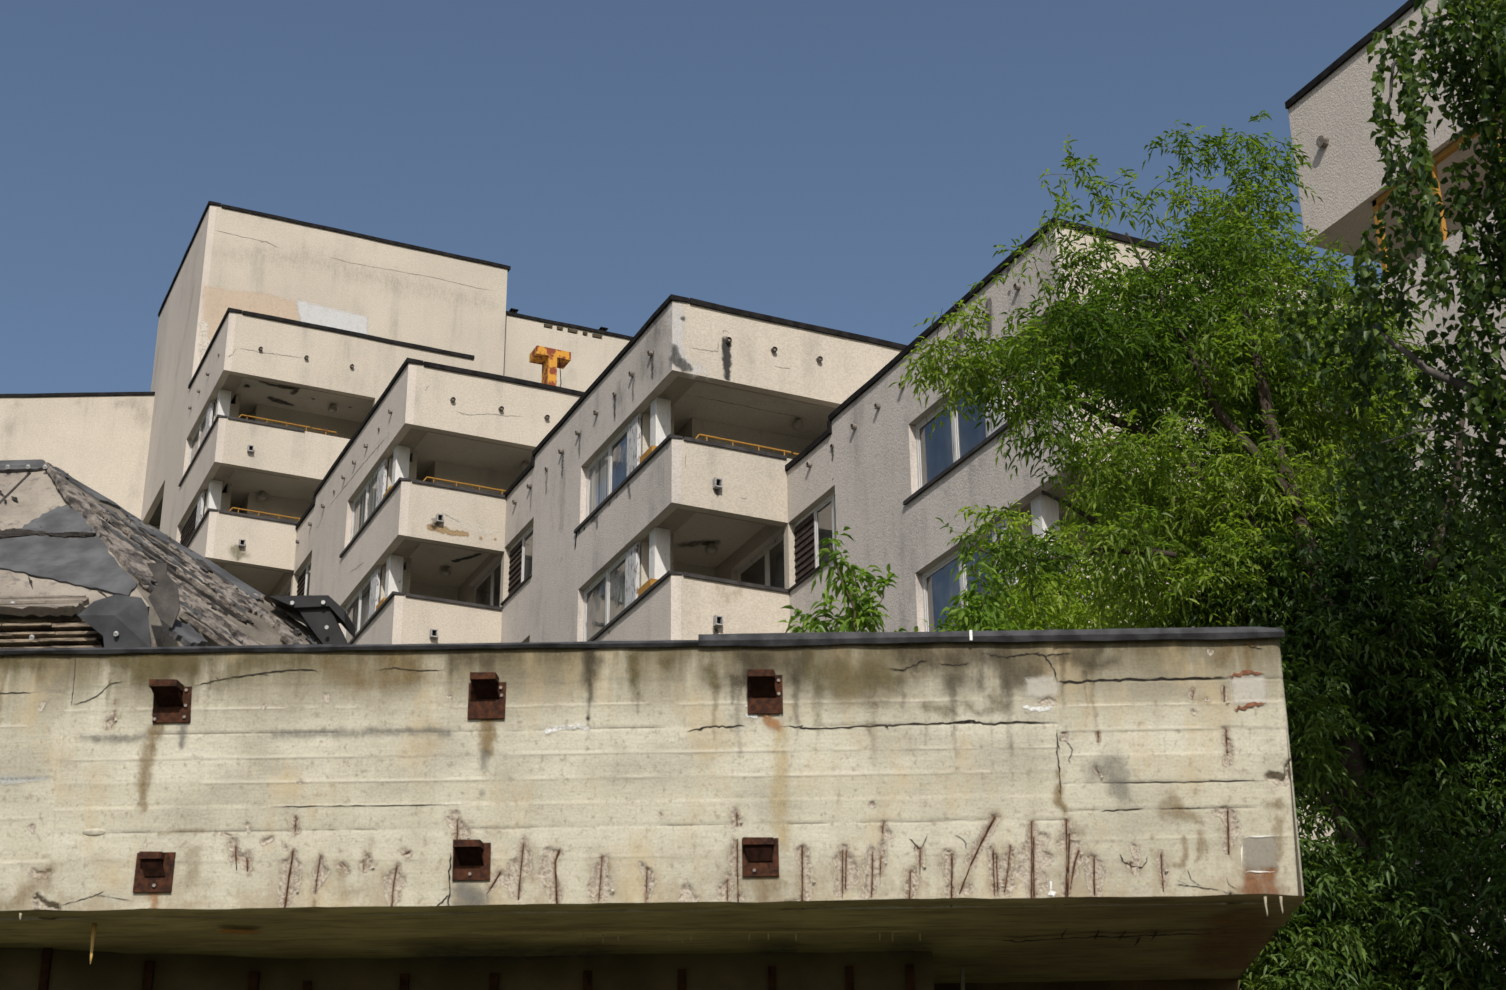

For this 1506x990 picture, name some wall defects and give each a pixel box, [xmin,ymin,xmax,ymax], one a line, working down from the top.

damp [722,337,732,380]
damp [584,648,597,687]
crack [890,652,1228,683]
crack [690,724,743,732]
crack [783,719,1073,798]
crack [1104,780,1256,811]
spalling [220,815,413,908]
spalling [486,835,564,904]
spalling [678,807,745,902]
spalling [783,801,893,909]
spalling [903,813,1107,907]
rust [1243,868,1278,894]